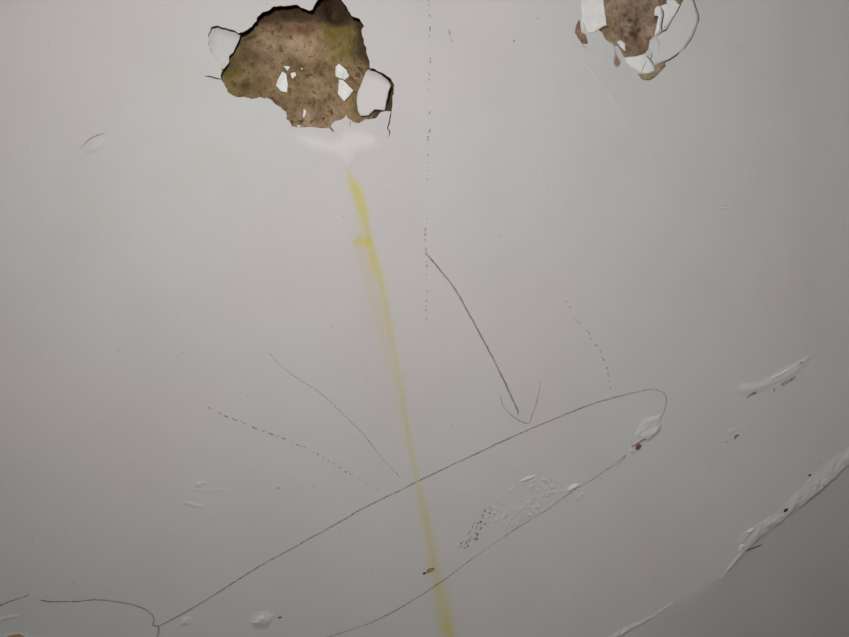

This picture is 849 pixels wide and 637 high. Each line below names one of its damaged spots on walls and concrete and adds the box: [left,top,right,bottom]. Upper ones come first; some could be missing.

spalling [206,0,394,137]
spalling [575,0,699,80]